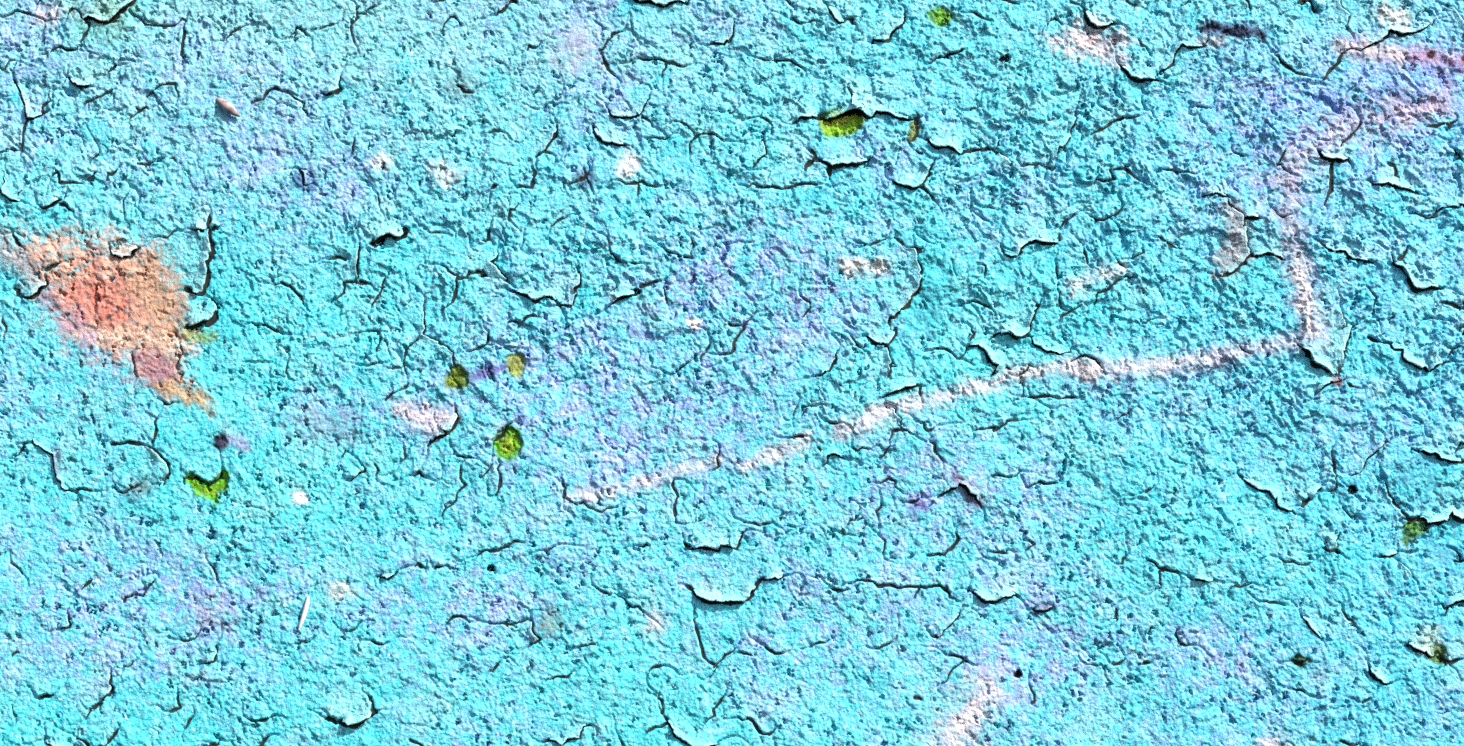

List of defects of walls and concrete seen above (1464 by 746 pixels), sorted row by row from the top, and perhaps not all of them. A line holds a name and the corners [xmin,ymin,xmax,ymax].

spalling [928,7,951,26]
crack [0,0,288,373]
crack [276,0,1208,401]
spalling [819,110,864,137]
crack [934,120,1464,432]
spalling [185,470,229,505]
spalling [444,364,469,388]
spalling [494,425,523,461]
crack [543,570,828,746]
crack [788,237,1058,701]
crack [1121,439,1464,703]
spalling [1402,520,1430,549]